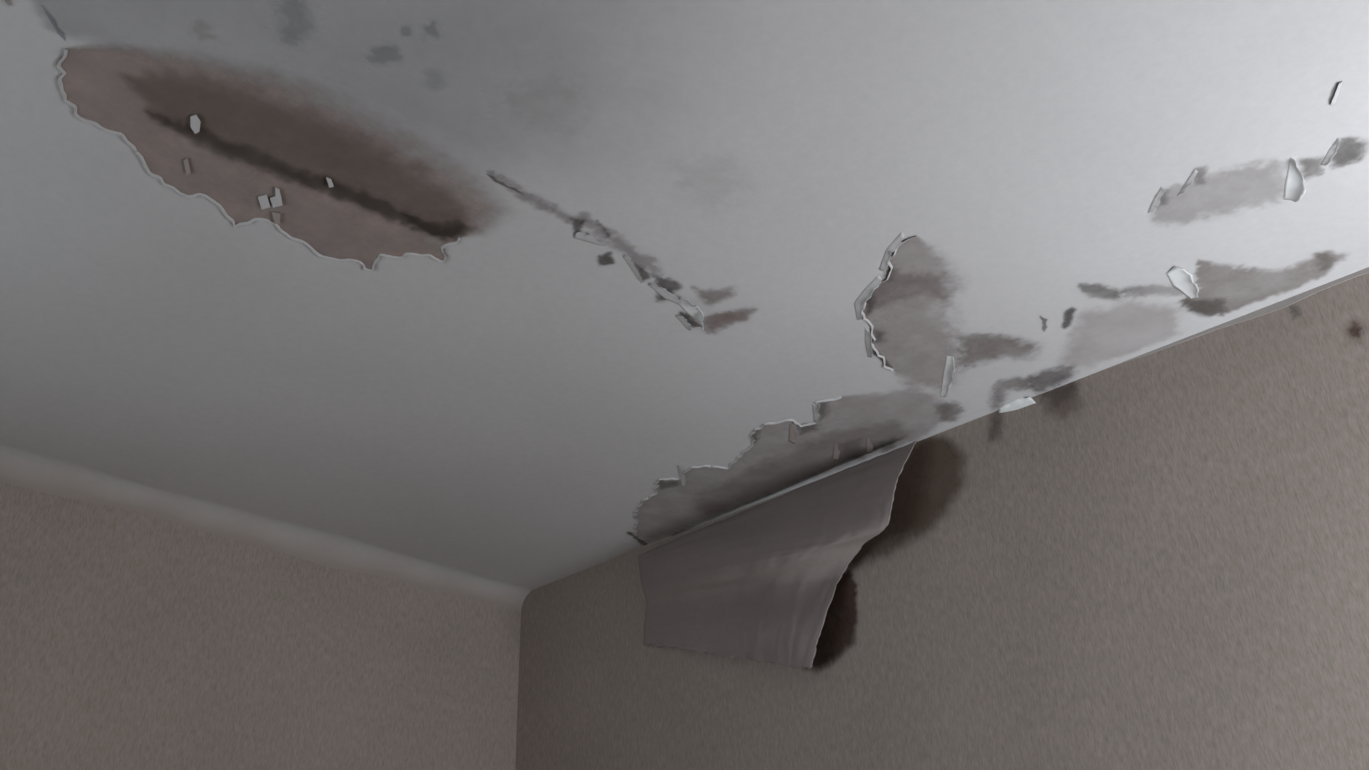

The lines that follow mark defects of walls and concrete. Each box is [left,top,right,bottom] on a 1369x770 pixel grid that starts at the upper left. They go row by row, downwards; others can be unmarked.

peeling [43,7,491,272]
peeling [1147,169,1198,213]
peeling [1283,138,1362,202]
peeling [573,219,745,331]
peeling [854,231,955,414]
peeling [1040,308,1075,331]
peeling [1166,254,1337,315]
peeling [628,396,842,545]